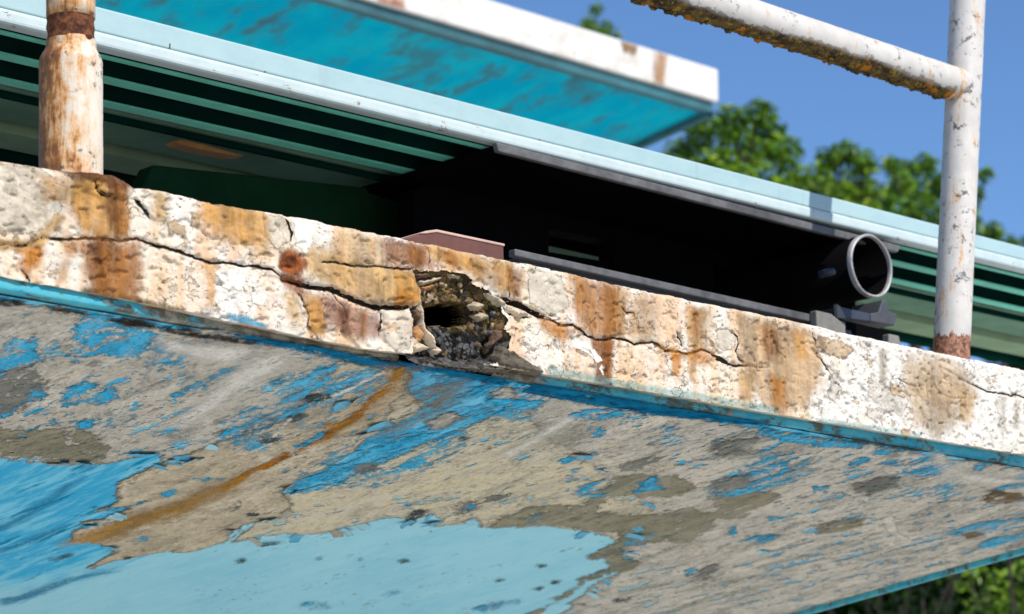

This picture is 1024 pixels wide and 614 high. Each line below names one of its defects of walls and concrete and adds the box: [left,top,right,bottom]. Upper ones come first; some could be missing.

corrosion [46,8,95,40]
corrosion [61,171,141,301]
crack [0,181,431,337]
corrosion [203,203,267,249]
corrosion [279,233,521,335]
corrosion [541,276,624,384]
crack [501,274,781,368]
corrosion [737,315,821,415]
crack [812,332,840,394]
crack [941,378,1024,399]
corrosion [67,366,405,545]
peeling [0,268,1024,614]